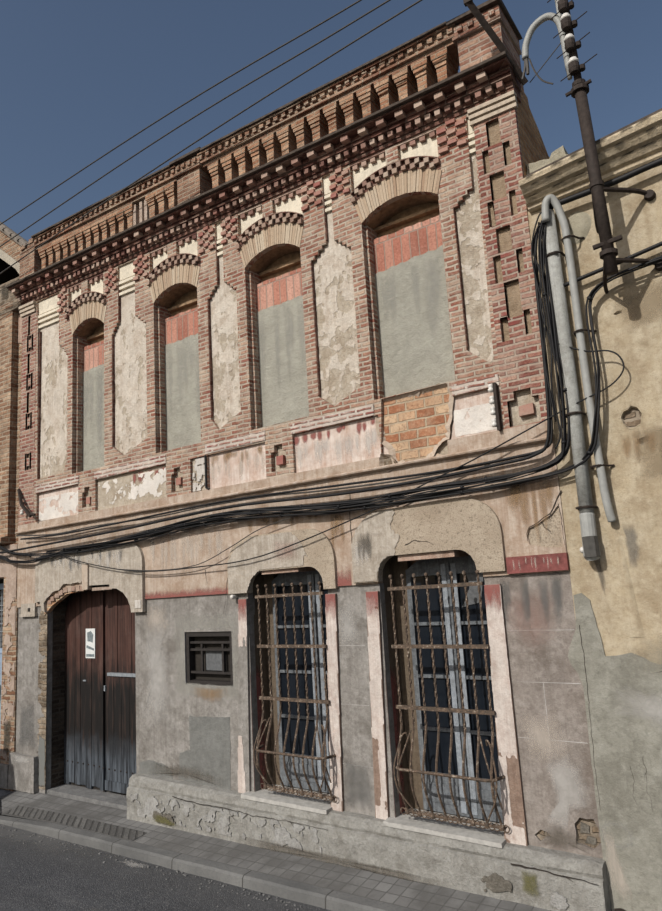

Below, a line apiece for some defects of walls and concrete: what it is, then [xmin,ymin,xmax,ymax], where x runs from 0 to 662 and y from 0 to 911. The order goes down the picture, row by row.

peeling [314,198,360,405]
peeling [210,244,241,428]
peeling [40,312,67,478]
peeling [115,280,147,455]
spalling [375,383,497,471]
spalling [619,406,642,428]
peeling [39,491,78,521]
peeling [98,468,166,505]
crack [526,490,566,547]
spalling [576,818,601,848]
spalling [481,873,512,893]